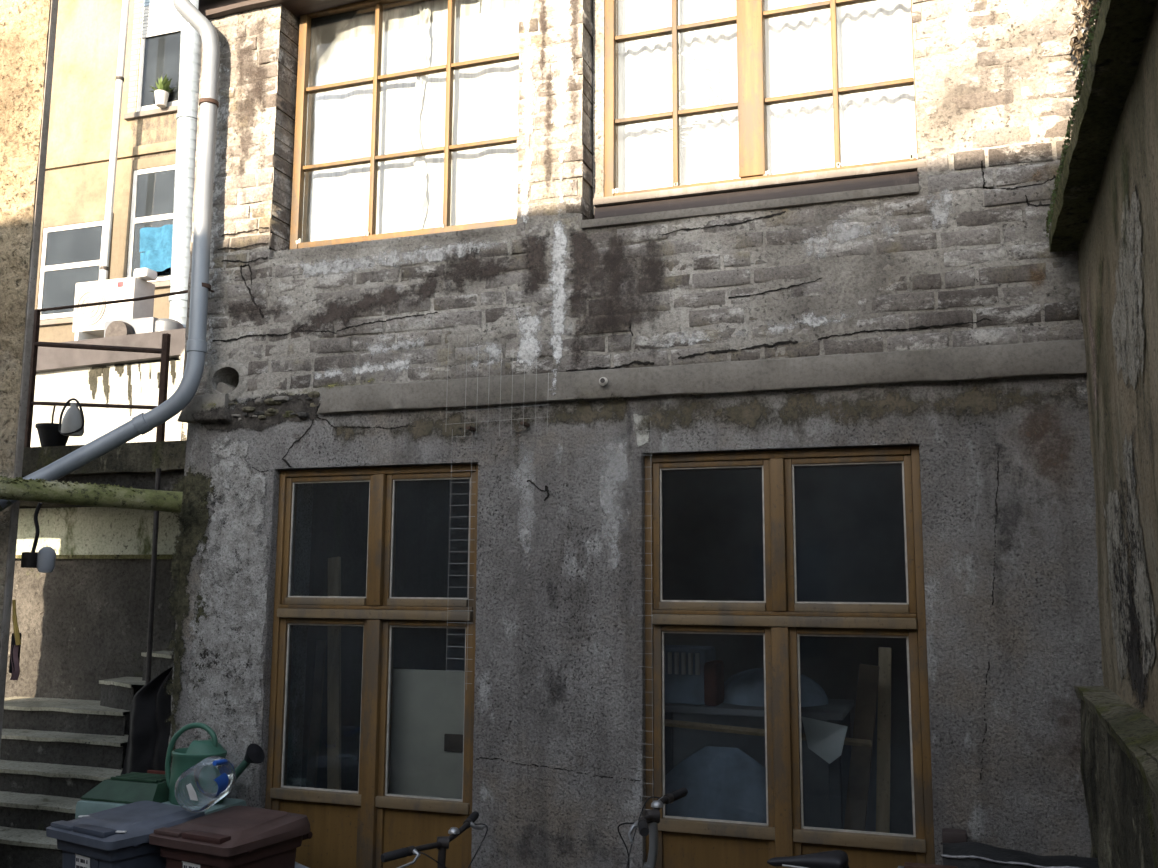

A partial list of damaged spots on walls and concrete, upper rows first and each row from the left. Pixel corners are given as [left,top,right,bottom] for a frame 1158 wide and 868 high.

damp [229,294,287,321]
crack [212,227,438,342]
damp [291,242,509,336]
damp [390,0,1088,566]
flaking render [1111,185,1145,394]
damp [88,360,181,416]
crack [214,417,416,501]
damp [335,424,365,441]
damp [313,338,424,379]
flaking render [1103,434,1156,710]